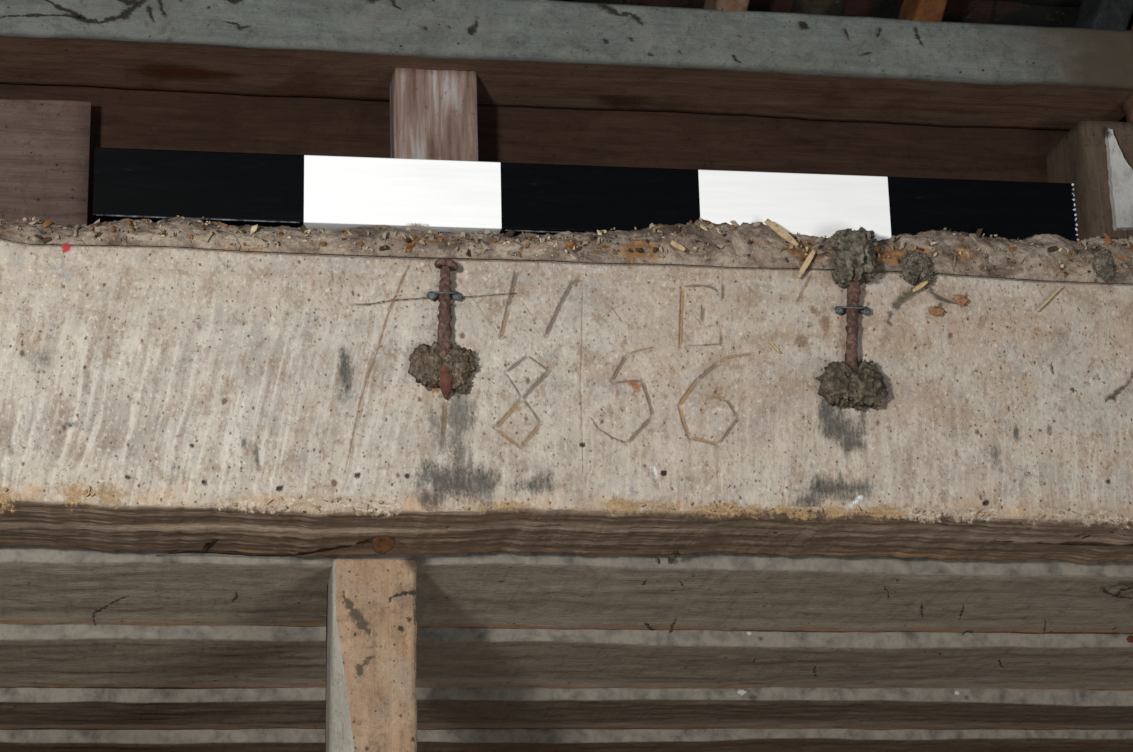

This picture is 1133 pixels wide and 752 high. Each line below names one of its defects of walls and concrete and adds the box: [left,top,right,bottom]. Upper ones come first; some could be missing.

water stain [818,399,864,453]
water stain [419,462,500,509]
water stain [793,478,868,511]
crack [157,539,371,556]